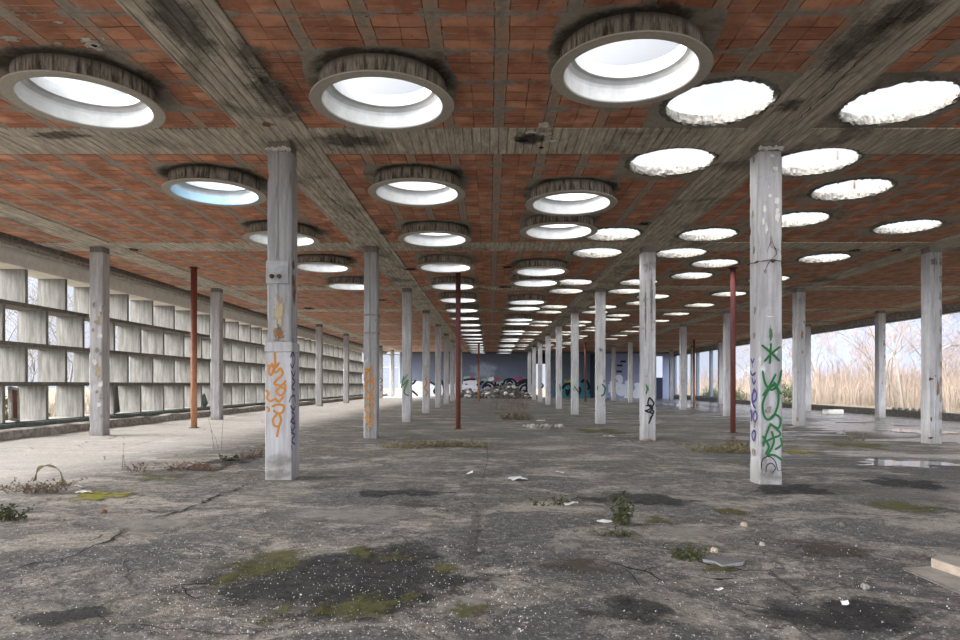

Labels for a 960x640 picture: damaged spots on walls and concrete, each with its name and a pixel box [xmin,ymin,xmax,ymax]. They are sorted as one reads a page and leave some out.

water stain [150,0,216,51]
water stain [825,0,933,74]
water stain [238,40,304,113]
crack [146,481,254,518]
crack [17,528,127,580]